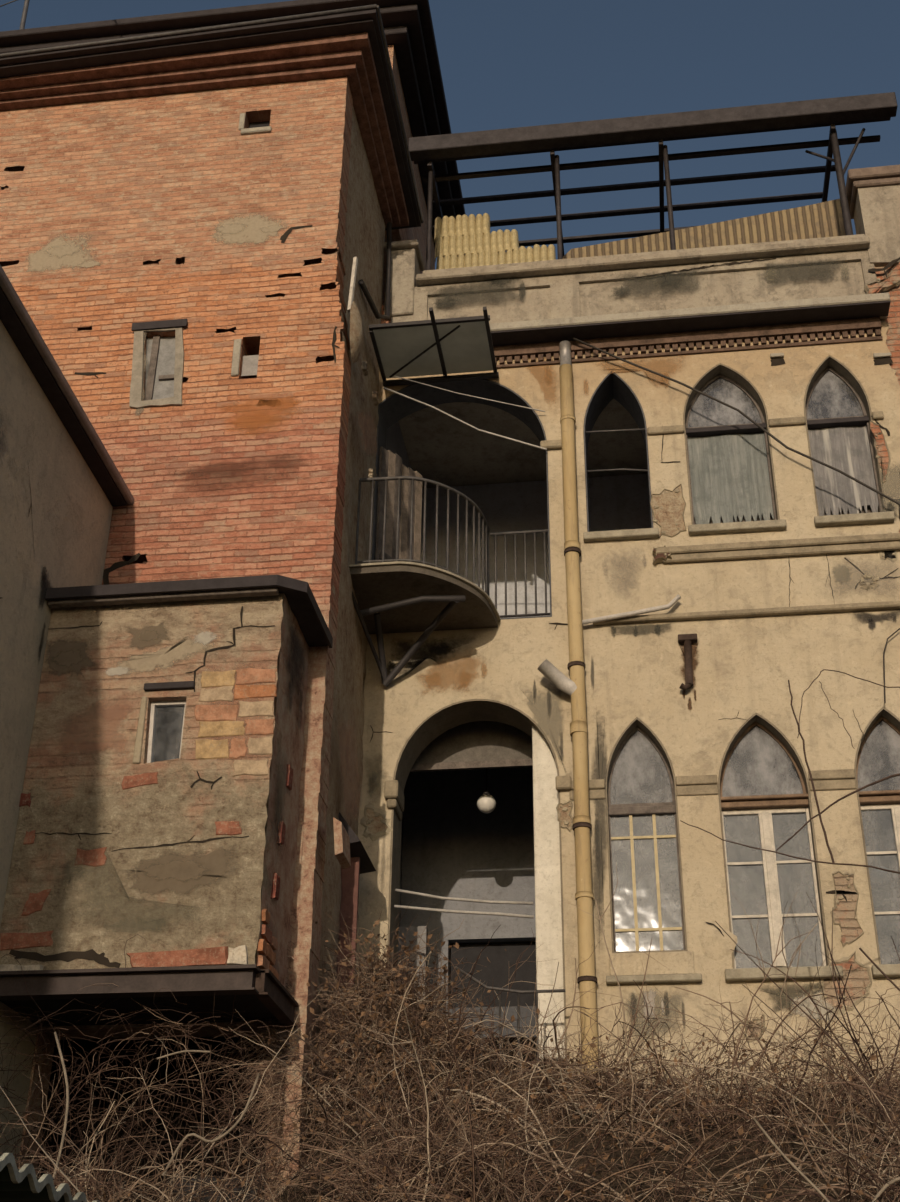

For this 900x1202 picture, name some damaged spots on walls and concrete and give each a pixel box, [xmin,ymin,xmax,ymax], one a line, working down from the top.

flaking render [864,261,900,294]
spalling [873,353,893,365]
flaking render [870,421,891,484]
flaking render [650,484,687,566]
crack [825,554,900,599]
crack [186,606,275,692]
flaking render [194,668,277,777]
flaking render [121,772,158,790]
crack [35,832,249,852]
flaking render [360,803,393,841]
crack [9,949,121,968]
flaking render [818,870,872,1015]